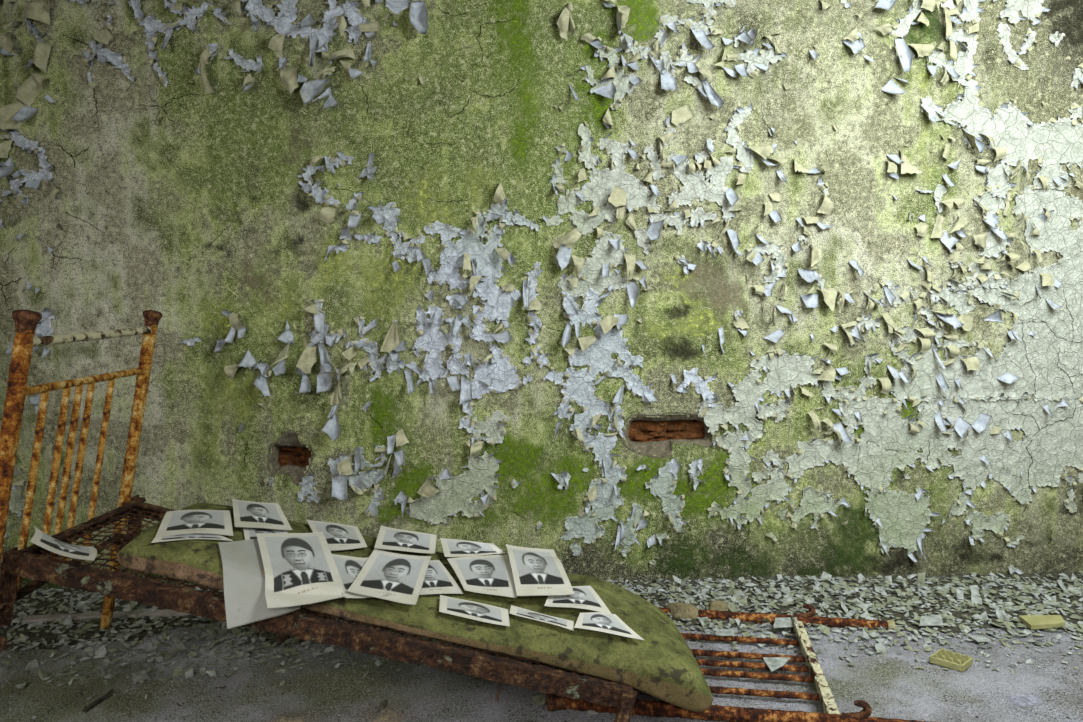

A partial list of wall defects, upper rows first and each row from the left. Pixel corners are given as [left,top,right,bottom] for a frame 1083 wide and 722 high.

damp [1048,0,1083,44]
peeling [128,0,428,120]
peeling [0,0,135,242]
damp [667,262,747,317]
peeling [32,307,55,360]
peeling [178,335,201,346]
peeling [214,0,1083,676]
damp [665,338,699,359]
peeling [4,465,25,539]
damp [882,551,914,573]
damp [954,539,1002,563]
peeling [0,587,385,719]